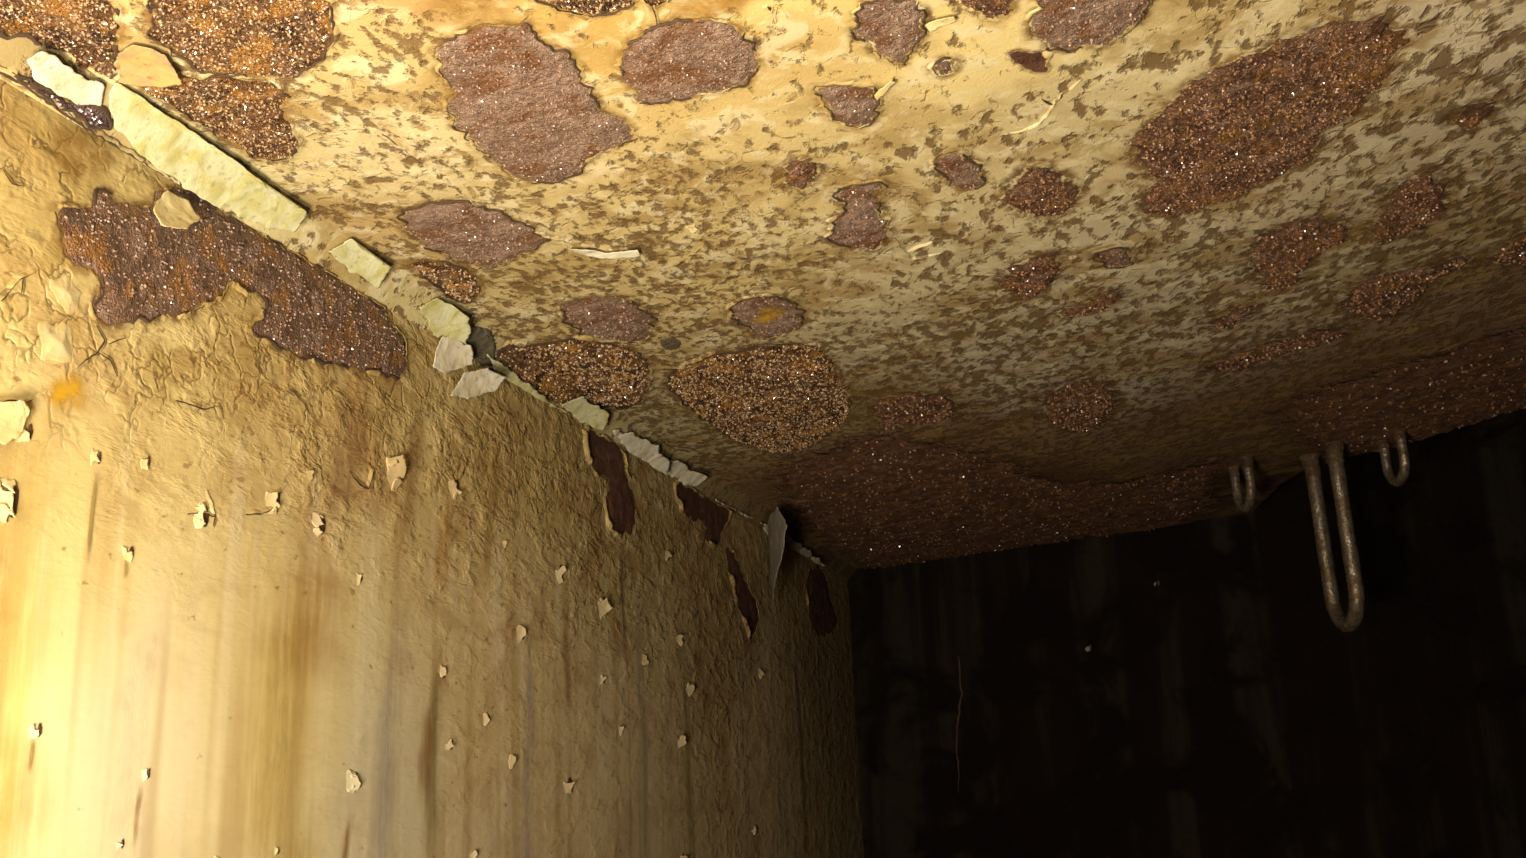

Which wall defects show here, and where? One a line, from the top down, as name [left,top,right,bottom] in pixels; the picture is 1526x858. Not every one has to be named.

crack [3,168,25,187]
crack [0,66,177,183]
peeling [26,45,307,232]
rust [137,0,341,162]
rust [430,0,762,184]
rust [1128,12,1414,218]
crack [0,395,33,403]
peeling [0,400,33,445]
crack [76,324,126,377]
rust [53,183,408,384]
peeling [328,239,392,289]
peeling [419,298,708,487]